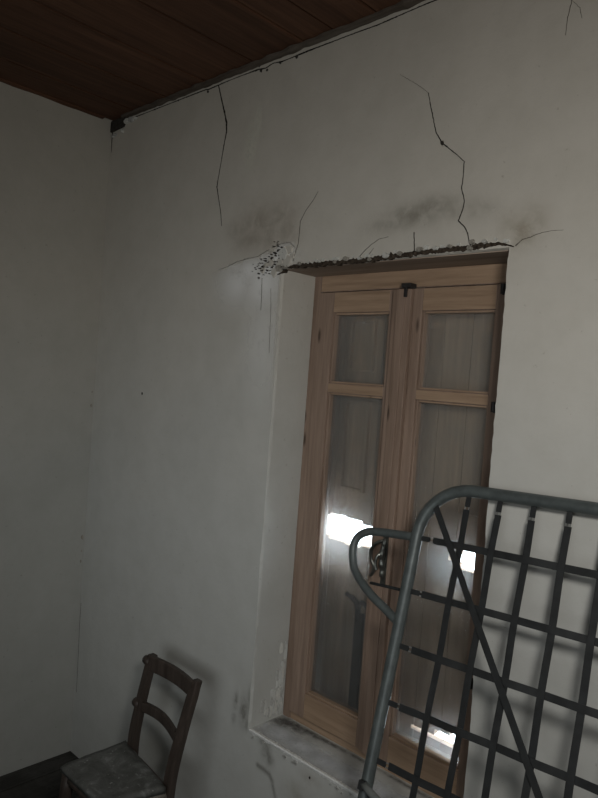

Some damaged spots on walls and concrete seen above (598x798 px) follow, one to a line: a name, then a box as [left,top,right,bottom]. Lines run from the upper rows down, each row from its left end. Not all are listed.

crack [401,75,471,245]
flaking render [252,238,514,279]
peeling [261,641,287,718]